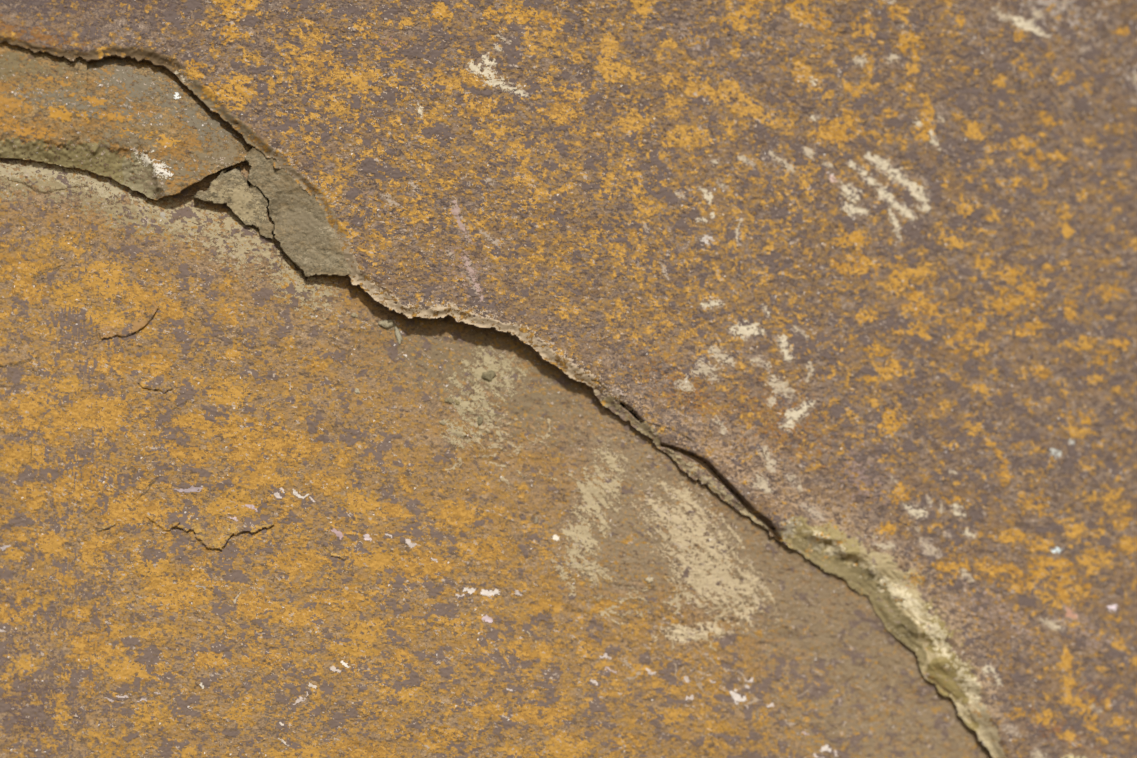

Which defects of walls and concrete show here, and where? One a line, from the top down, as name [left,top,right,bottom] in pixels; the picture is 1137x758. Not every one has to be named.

spalling [0,36,99,61]
spalling [0,137,162,199]
spalling [98,44,1007,758]
crack [591,379,776,533]